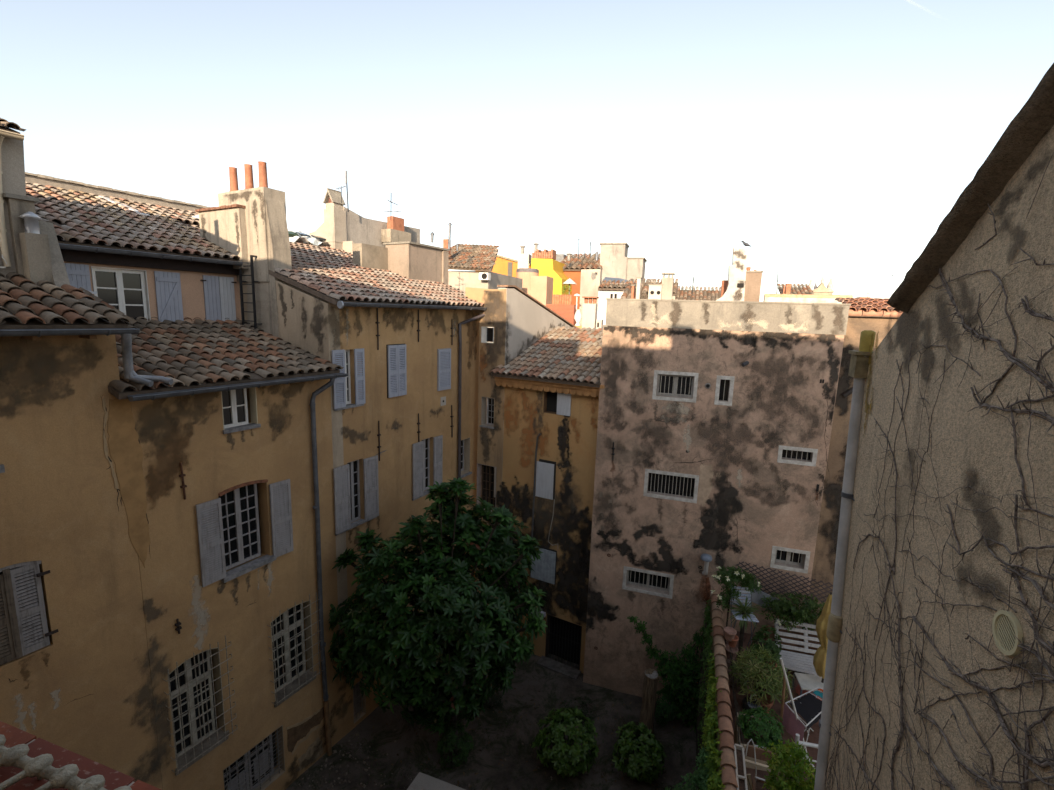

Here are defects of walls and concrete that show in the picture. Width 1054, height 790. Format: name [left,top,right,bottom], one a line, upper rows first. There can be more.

leakage [642,302,682,325]
leakage [721,251,767,329]
leakage [0,337,101,416]
leakage [135,392,218,502]
leakage [484,306,854,633]